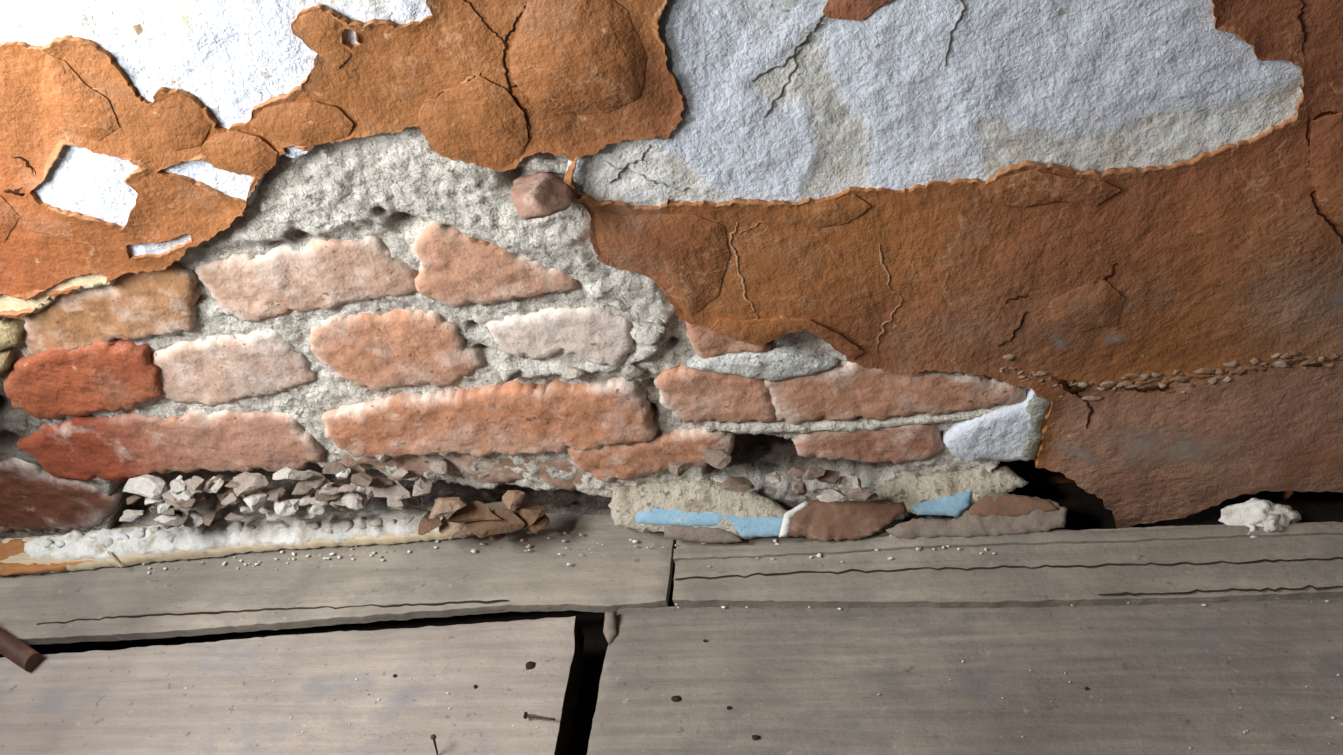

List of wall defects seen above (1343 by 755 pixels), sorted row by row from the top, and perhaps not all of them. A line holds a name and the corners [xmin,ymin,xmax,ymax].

crack [419,0,532,139]
spalling [0,0,1303,539]
crack [1296,0,1343,244]
peeling [1310,112,1343,227]